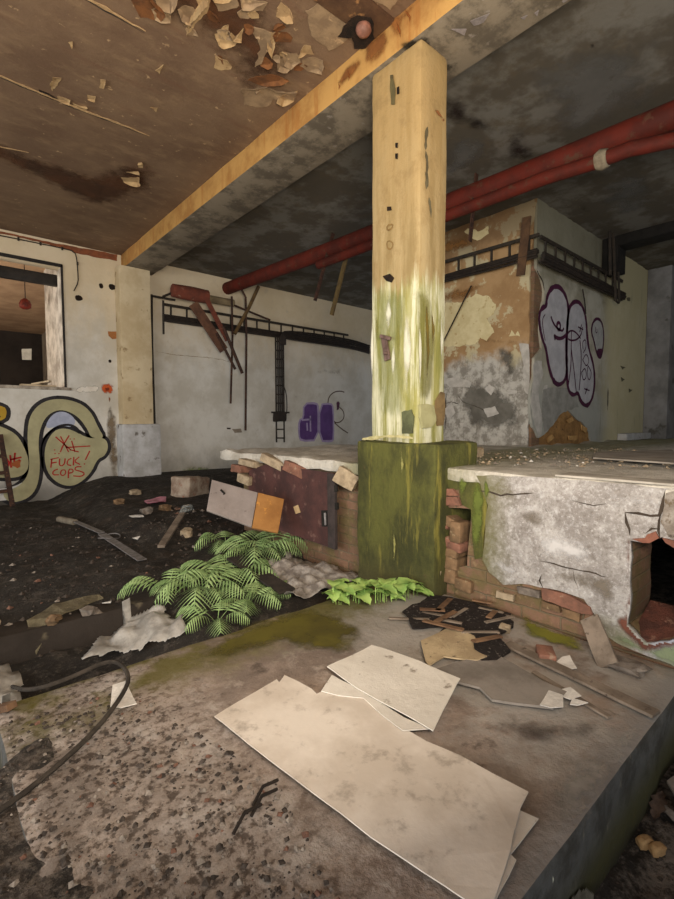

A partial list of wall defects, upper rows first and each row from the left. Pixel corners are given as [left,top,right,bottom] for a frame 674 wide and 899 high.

crack [86,0,146,33]
peeling [131,0,374,107]
peeling [39,77,106,110]
damp [0,148,144,202]
peeling [464,226,489,241]
damp [392,308,443,376]
peeling [444,294,496,347]
peeling [484,406,499,417]
damp [460,479,489,543]
crack [482,489,532,497]
crack [625,492,665,538]
crack [539,561,608,588]